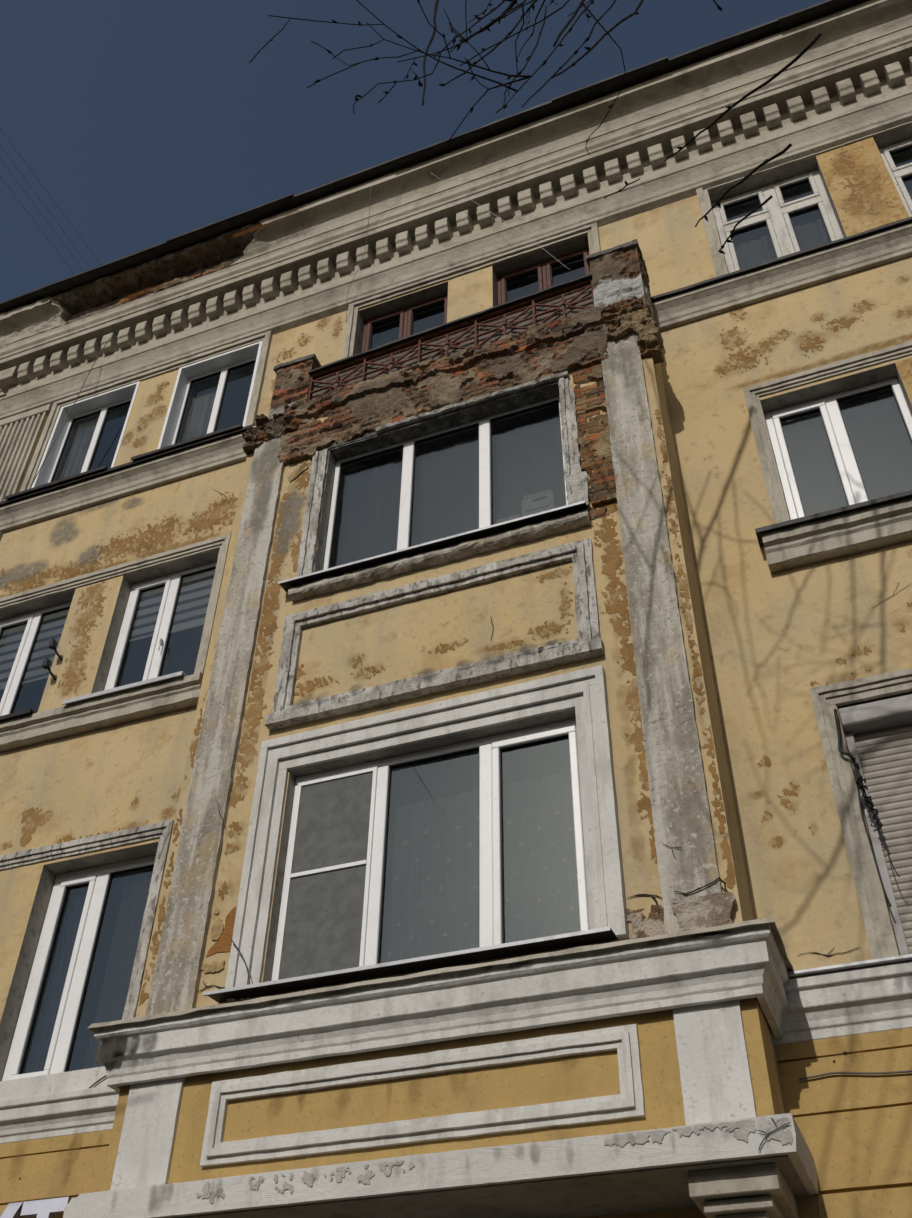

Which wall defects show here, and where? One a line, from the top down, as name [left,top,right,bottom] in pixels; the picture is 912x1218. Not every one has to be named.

spalling [118,258,239,305]
peeling [713,299,875,377]
peeling [0,491,238,697]
spalling [224,296,664,863]
peeling [654,408,736,889]
peeling [3,807,53,850]
peeling [760,782,800,823]
spalling [626,905,666,939]